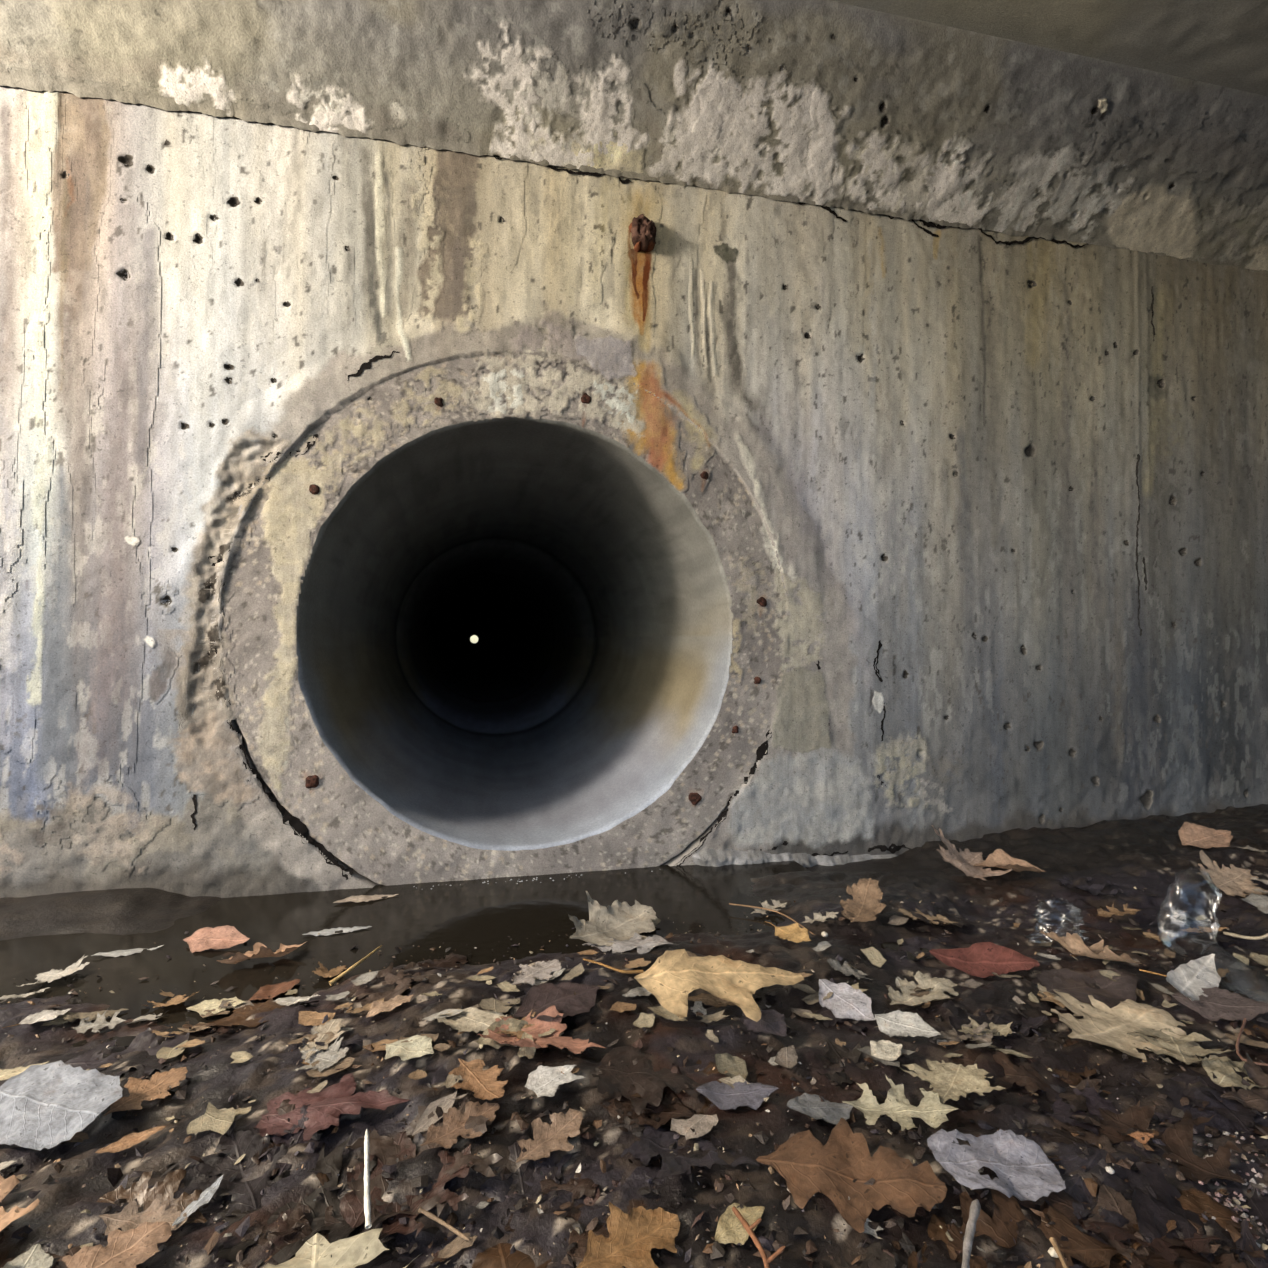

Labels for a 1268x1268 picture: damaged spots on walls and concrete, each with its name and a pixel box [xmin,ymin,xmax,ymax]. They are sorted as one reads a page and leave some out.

crack [546,165,631,184]
crack [798,202,847,222]
crack [888,216,1088,248]
crack [348,351,400,380]
corrosion [588,174,720,493]
water stain [0,14,1268,819]
crack [233,434,318,501]
crack [207,550,353,880]
crack [676,730,772,866]